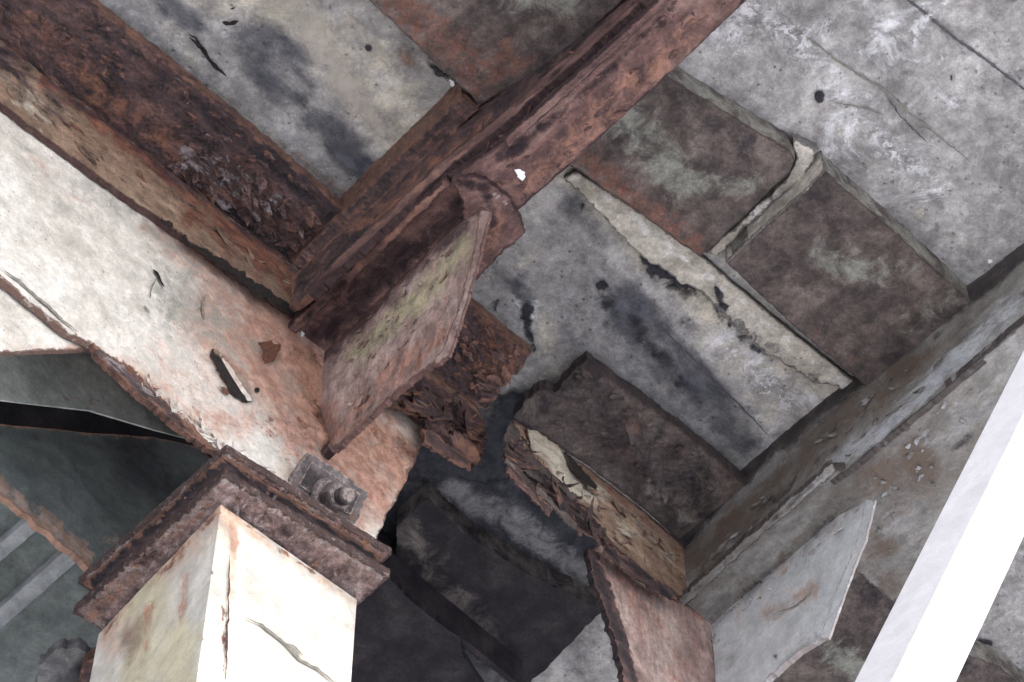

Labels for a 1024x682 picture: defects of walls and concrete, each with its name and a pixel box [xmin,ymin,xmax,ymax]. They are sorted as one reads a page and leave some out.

damp [157,0,203,31]
damp [239,0,387,178]
peeling [187,235,219,256]
damp [503,275,529,300]
rust [258,338,281,363]
damp [601,285,755,452]
crack [225,558,334,682]